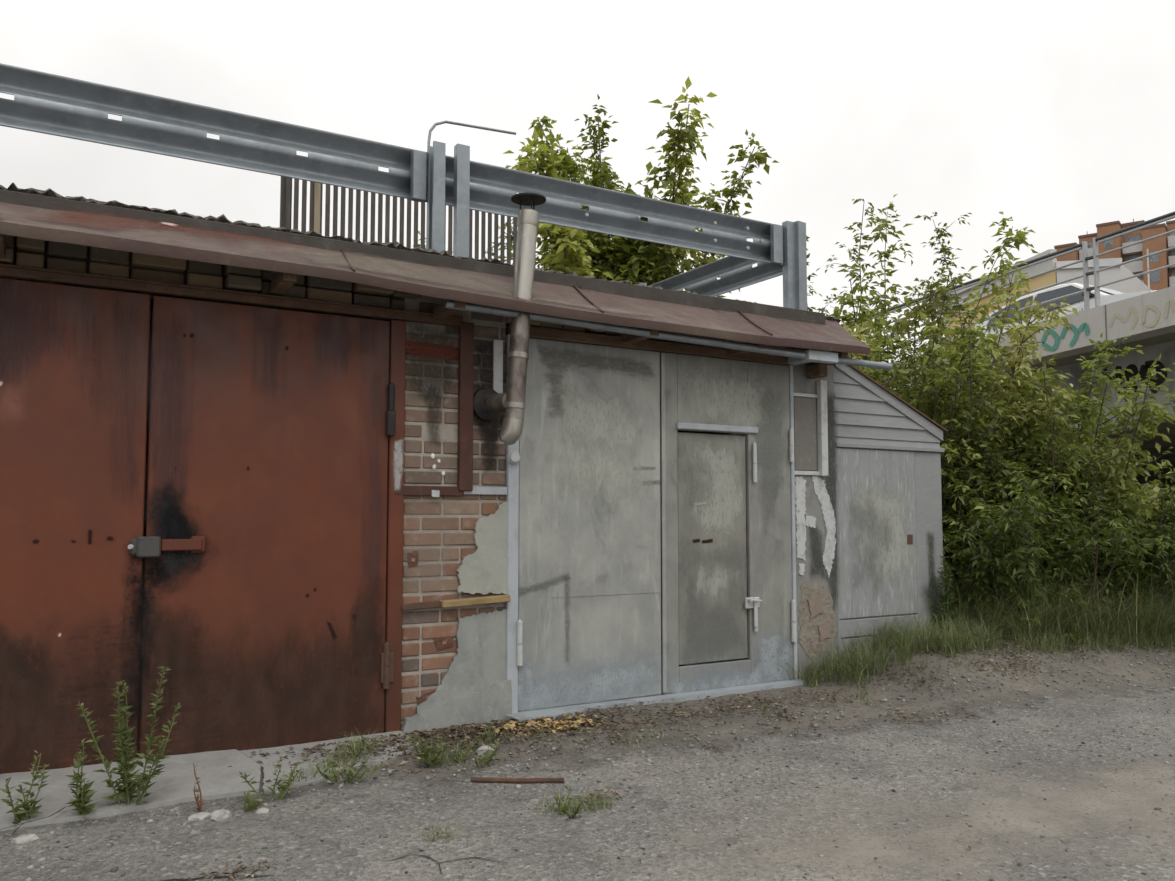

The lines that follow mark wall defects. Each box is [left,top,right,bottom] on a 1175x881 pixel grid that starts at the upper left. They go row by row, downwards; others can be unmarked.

spalling [795,475,837,659]
peeling [253,645,1175,834]